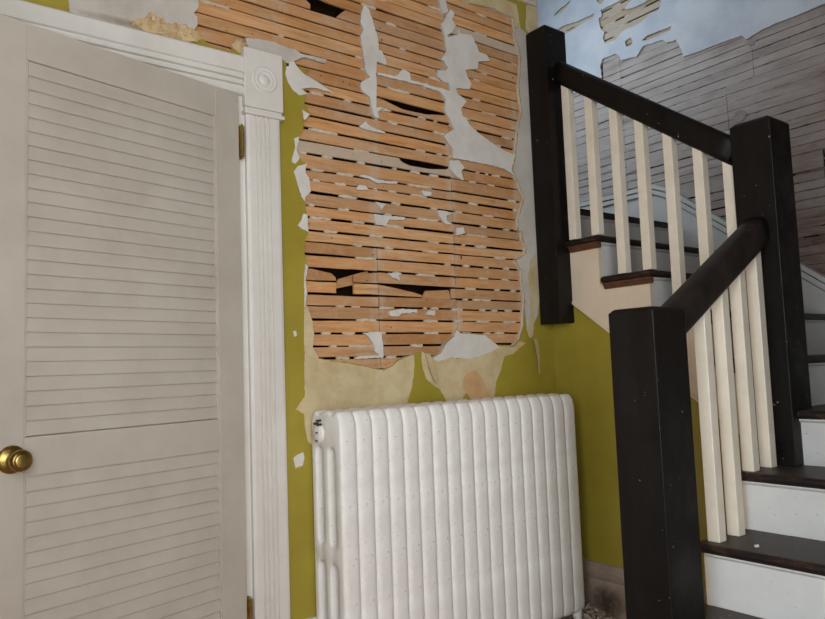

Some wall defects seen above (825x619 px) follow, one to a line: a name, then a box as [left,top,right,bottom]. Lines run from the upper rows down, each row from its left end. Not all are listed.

spalling [559,0,661,43]
spalling [573,93,590,203]
spalling [597,103,614,198]
spalling [603,5,825,275]
spalling [68,0,542,444]
peeling [293,452,304,468]